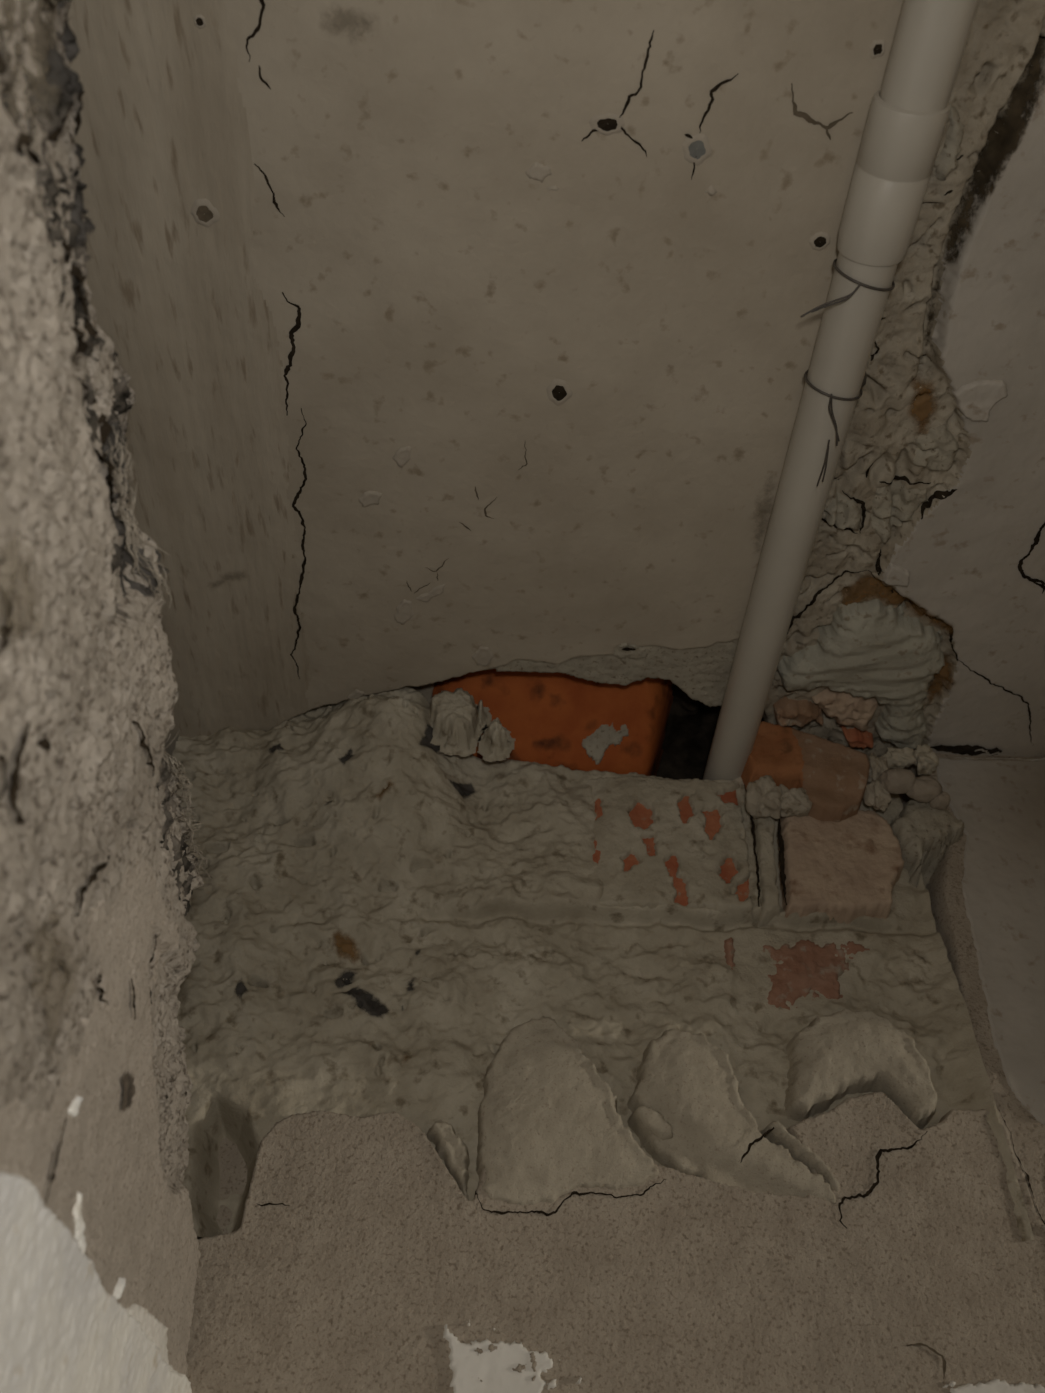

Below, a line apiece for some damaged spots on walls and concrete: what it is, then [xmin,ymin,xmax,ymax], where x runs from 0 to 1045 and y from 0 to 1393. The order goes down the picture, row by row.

crack [246,0,271,89]
crack [582,30,654,157]
crack [685,73,739,180]
crack [282,292,307,679]
crack [787,463,1034,745]
crack [1018,523,1045,594]
spalling [156,686,1045,1242]
crack [741,1127,774,1162]
crack [838,1132,927,1229]
peeling [443,1320,556,1393]
peeling [942,1379,1045,1393]